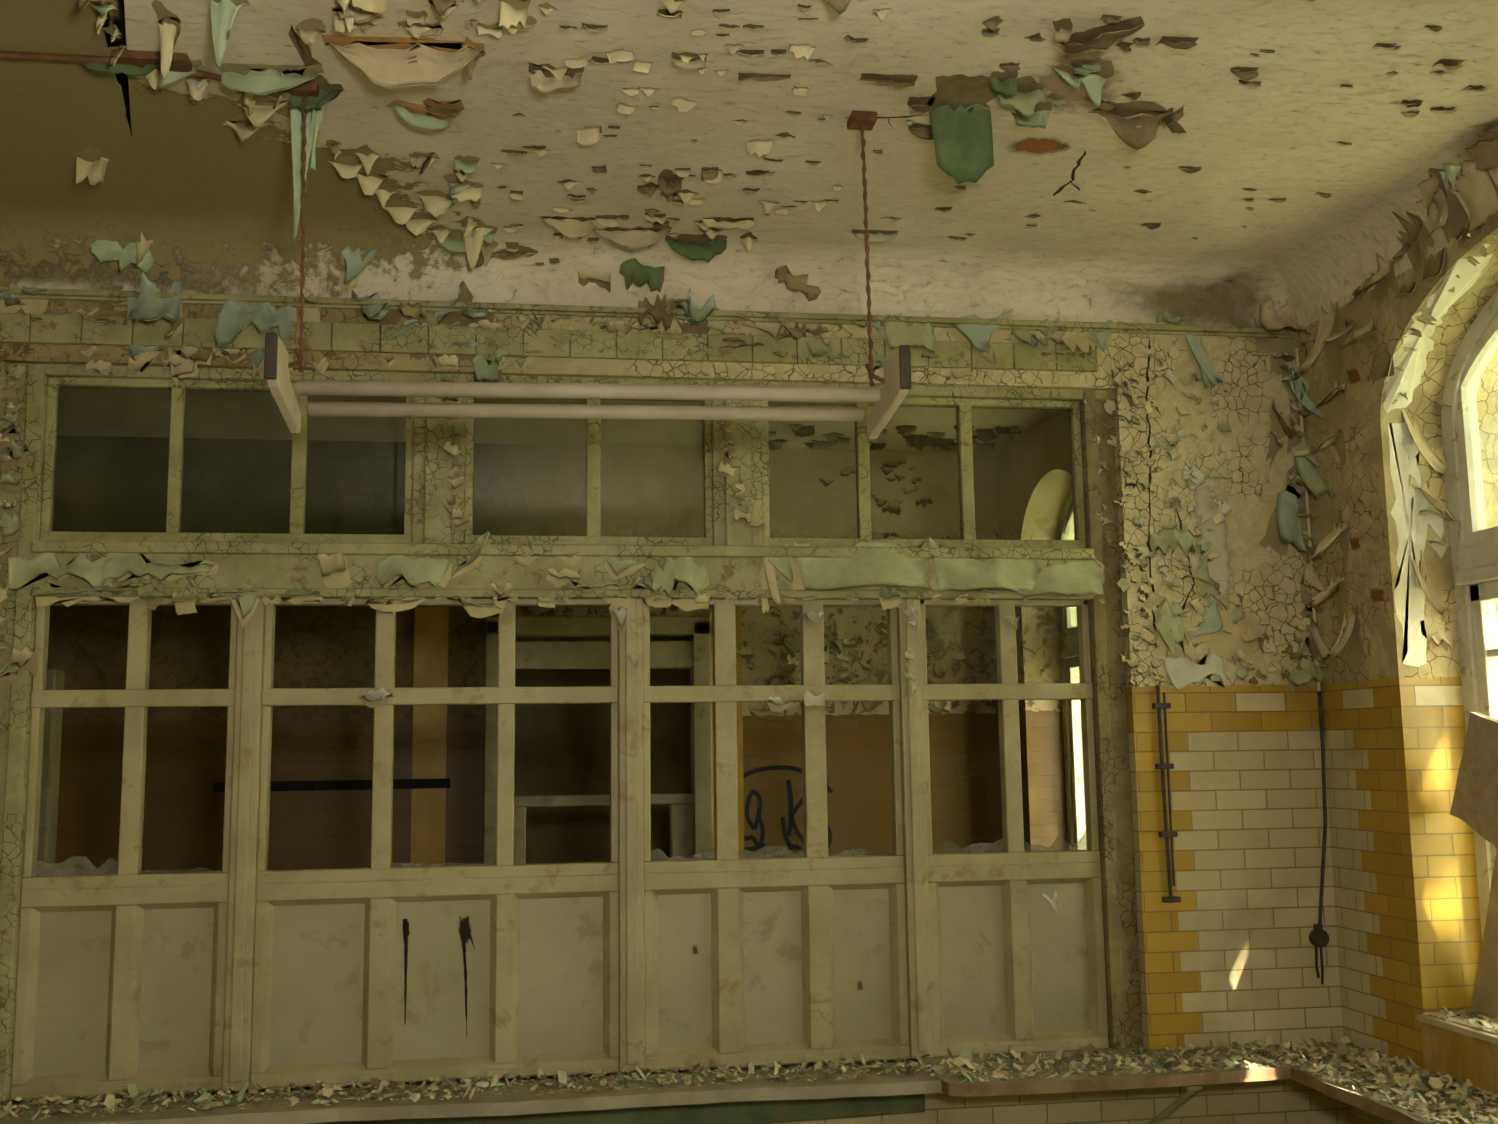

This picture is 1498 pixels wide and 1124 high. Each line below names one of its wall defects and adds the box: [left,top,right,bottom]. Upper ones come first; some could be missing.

peeling [0,0,1498,716]
crack [1145,337,1227,656]